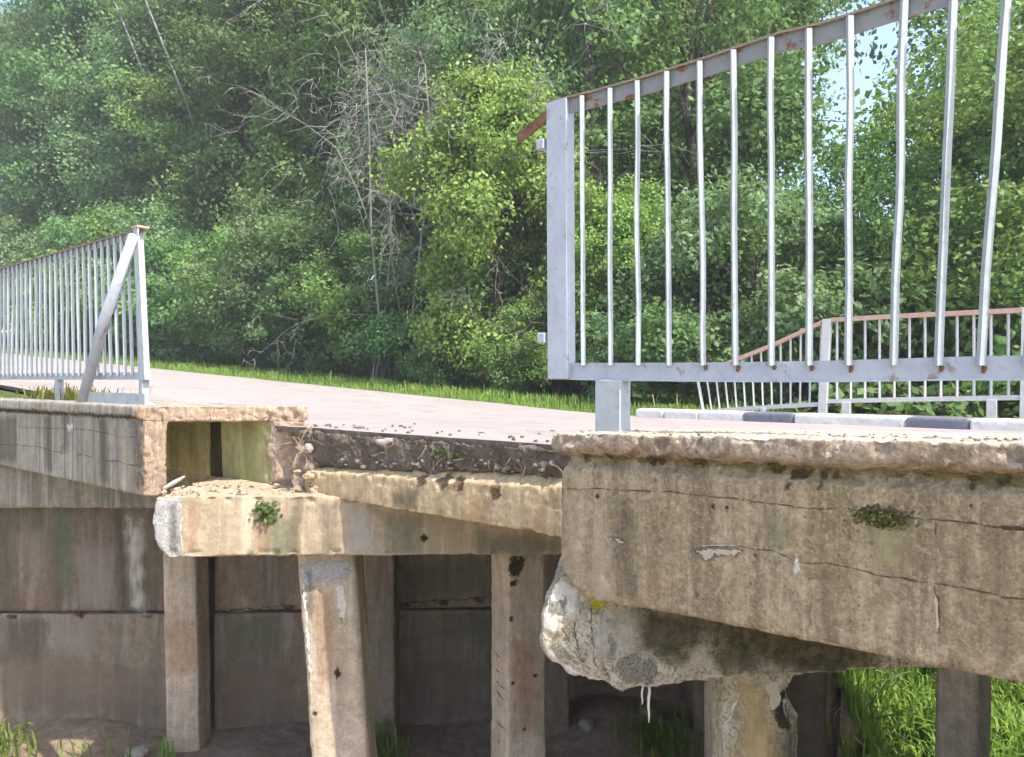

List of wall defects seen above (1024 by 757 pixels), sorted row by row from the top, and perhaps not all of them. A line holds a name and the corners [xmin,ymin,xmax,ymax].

crack [1,422,136,466]
spalling [417,473,465,491]
peeling [153,497,183,557]
spalling [696,545,741,560]
crack [908,517,1024,551]
peeling [299,559,350,620]
crack [710,546,1024,633]